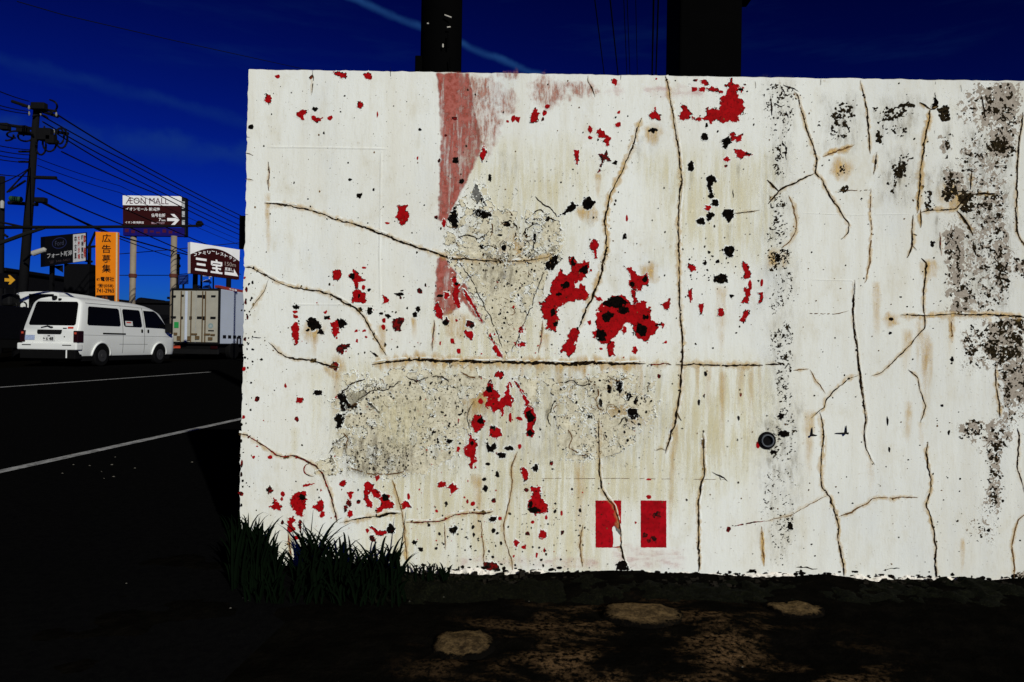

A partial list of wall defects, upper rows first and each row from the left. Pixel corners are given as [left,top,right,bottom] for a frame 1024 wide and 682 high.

peeling [263,173,765,558]
crack [239,75,1024,577]
peeling [677,77,755,167]
water stain [664,163,794,315]
water stain [760,324,797,559]
water stain [762,83,797,181]
water stain [818,102,856,140]
water stain [873,101,915,143]
water stain [887,153,914,194]
water stain [921,83,1024,542]